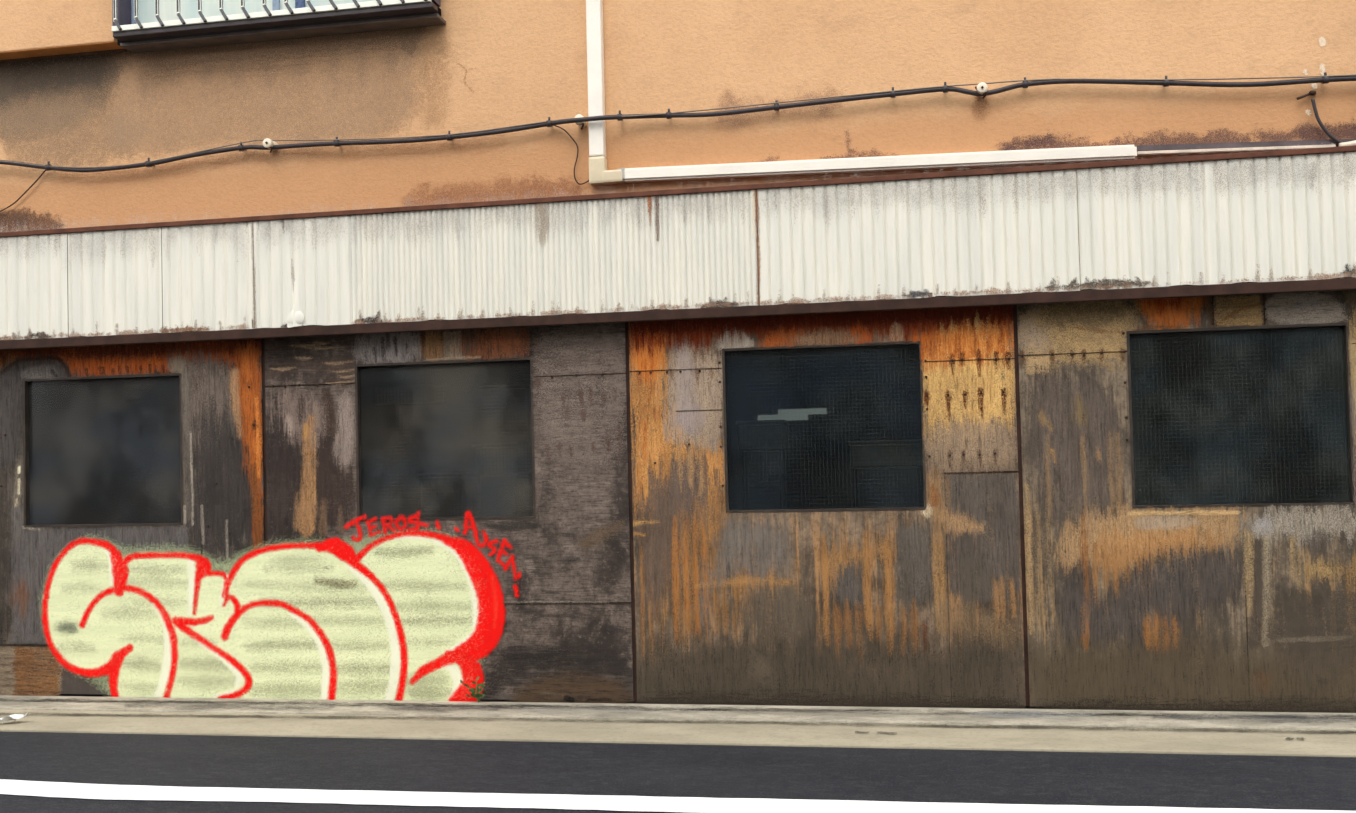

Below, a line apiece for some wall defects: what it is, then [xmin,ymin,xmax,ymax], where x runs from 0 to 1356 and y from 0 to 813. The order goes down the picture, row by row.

water stain [996,119,1356,212]
rust [0,225,264,570]
rust [352,189,1356,663]